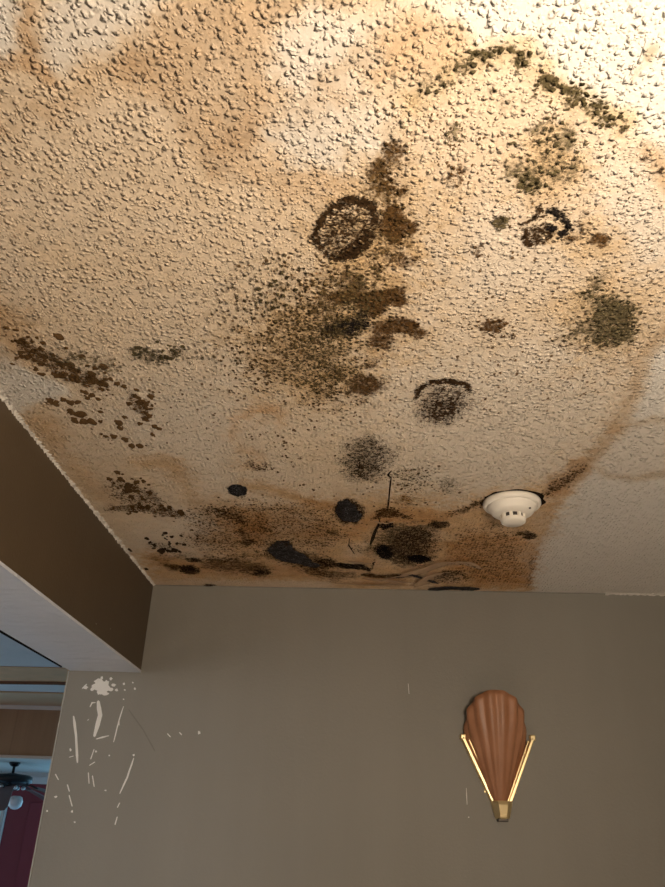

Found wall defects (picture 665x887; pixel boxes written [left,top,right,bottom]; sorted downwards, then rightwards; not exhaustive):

water stain [0,0,665,592]
peeling [82,676,136,700]